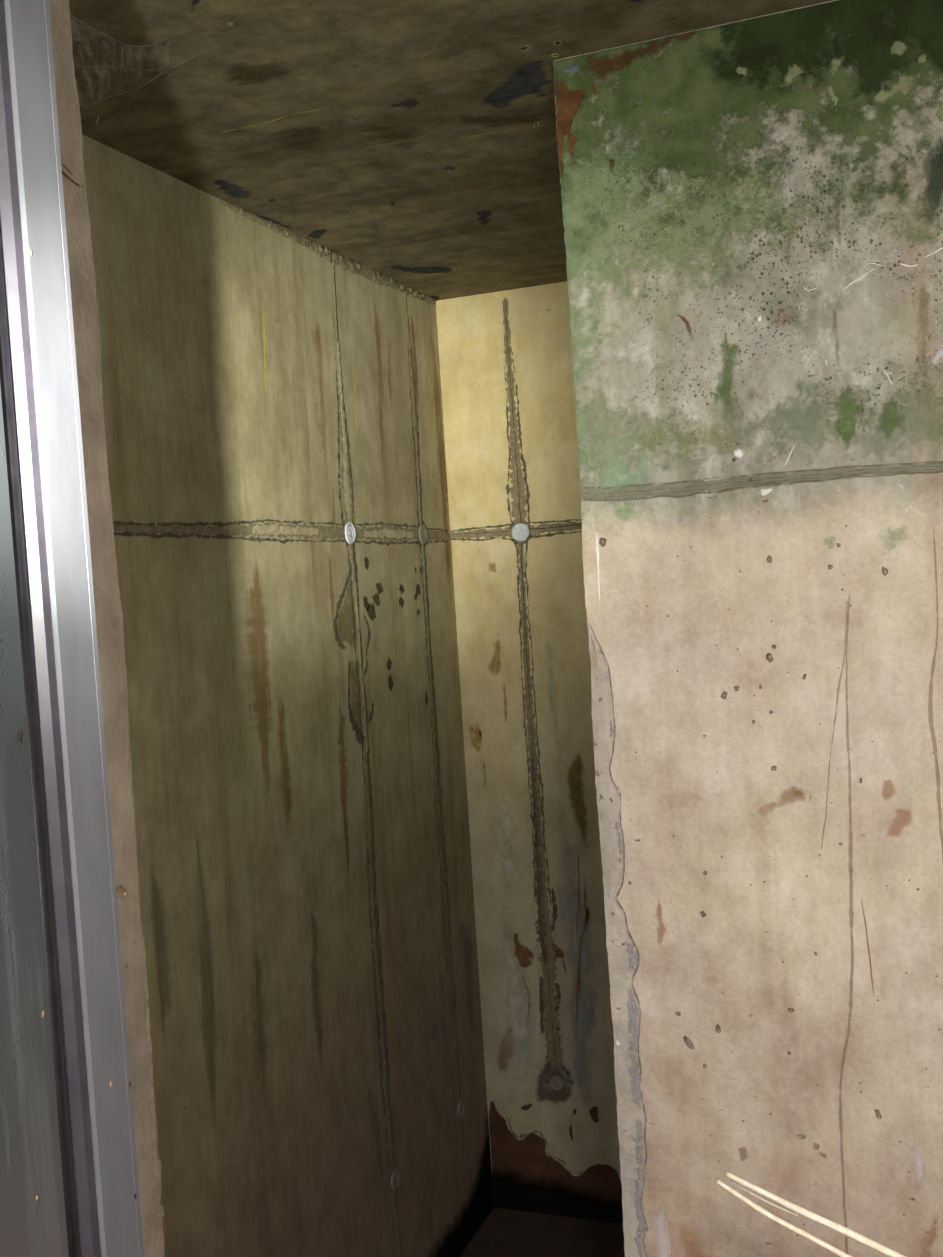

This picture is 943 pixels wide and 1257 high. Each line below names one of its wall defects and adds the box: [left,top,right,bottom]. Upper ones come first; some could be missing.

corrosion [555,31,696,178]
leakage [705,155,921,362]
leakage [825,365,923,411]
spalling [489,619,648,1257]